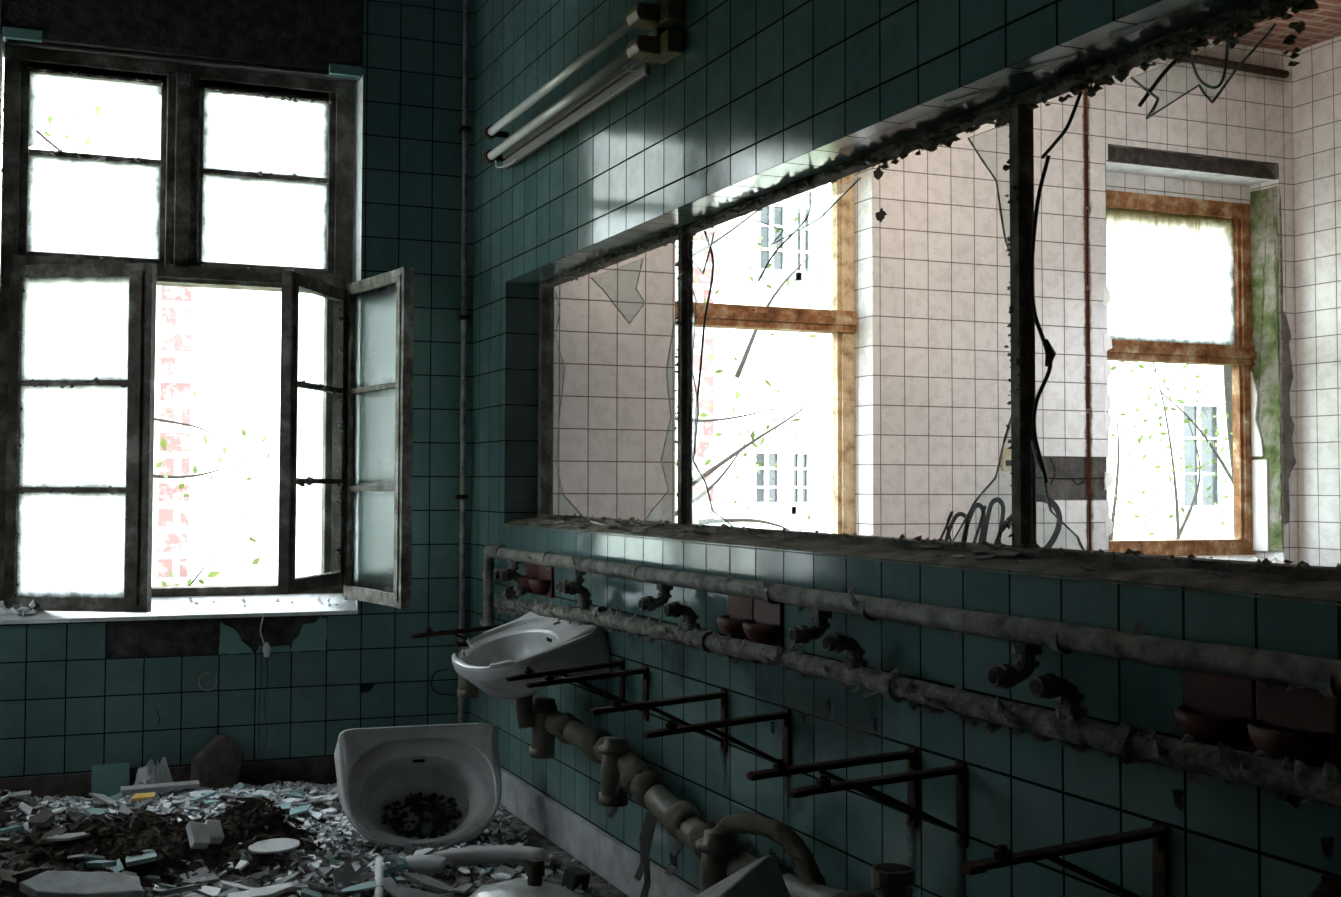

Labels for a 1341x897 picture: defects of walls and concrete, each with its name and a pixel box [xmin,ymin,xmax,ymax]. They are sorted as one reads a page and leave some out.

flaking render [1171,24,1246,64]
flaking render [1282,0,1307,66]
flaking render [1071,75,1114,97]
peeling [858,157,899,180]
peeling [107,615,327,658]